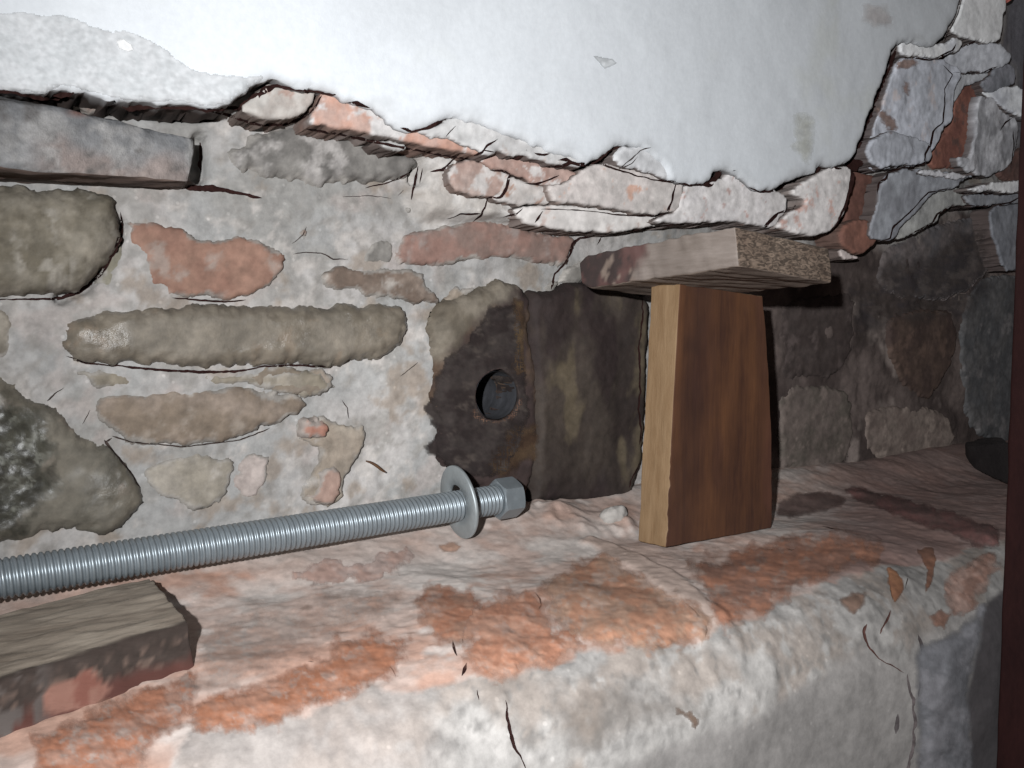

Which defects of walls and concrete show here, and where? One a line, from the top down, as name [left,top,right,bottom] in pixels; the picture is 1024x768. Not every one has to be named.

crack [0,90,74,101]
peeling [361,141,406,159]
crack [123,0,996,289]
peeling [852,0,1022,273]
crack [1001,118,1015,164]
crack [879,188,1018,242]
peeling [828,249,858,262]
spalling [777,487,999,626]
spalling [415,534,903,676]
crack [862,578,919,768]
crack [506,702,526,768]